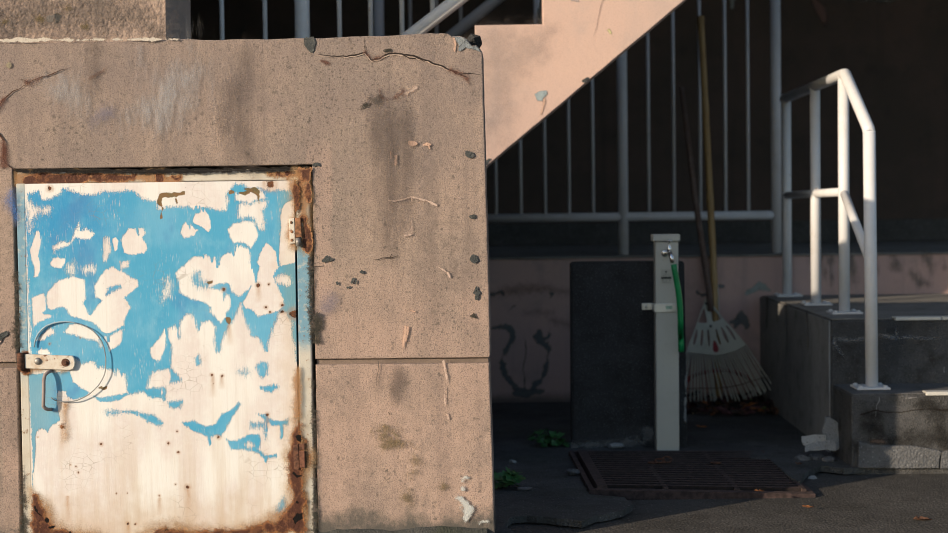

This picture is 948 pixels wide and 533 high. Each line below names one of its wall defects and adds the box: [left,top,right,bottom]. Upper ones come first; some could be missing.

crack [318,38,480,81]
crack [0,67,71,106]
crack [0,134,15,170]
rust [14,172,183,184]
rust [145,367,314,533]
spalling [793,416,839,462]
rust [29,489,91,533]